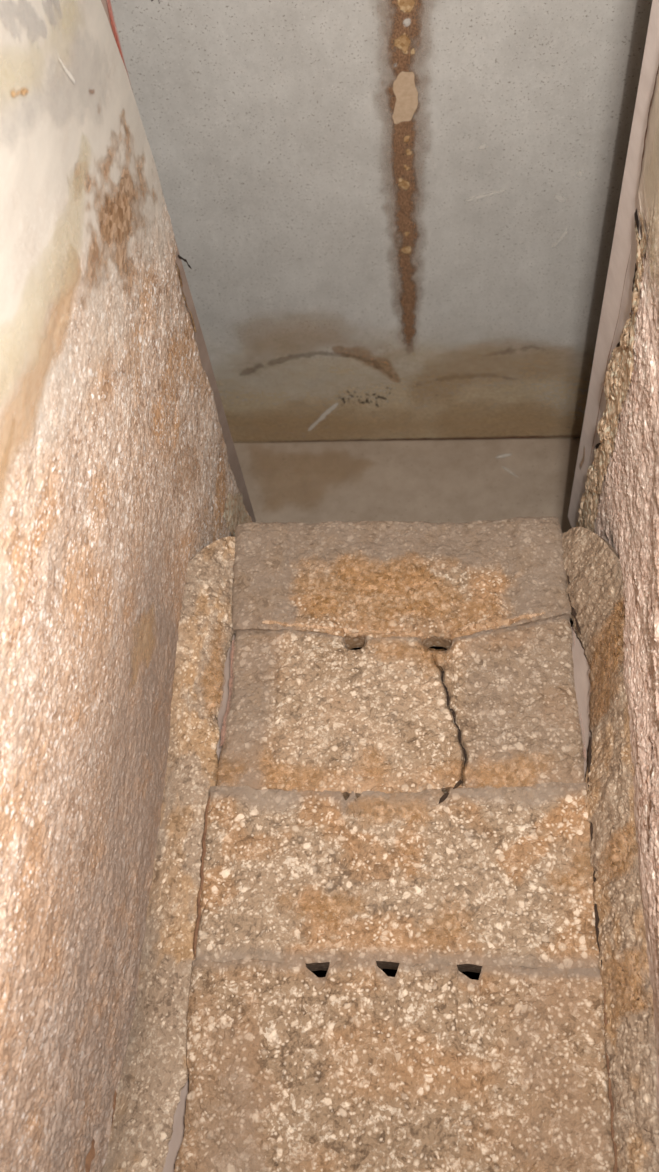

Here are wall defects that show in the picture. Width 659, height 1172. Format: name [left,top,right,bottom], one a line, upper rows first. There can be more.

rust [385,0,422,346]
leakage [222,349,584,442]
spalling [576,209,647,533]
crack [433,659,467,804]